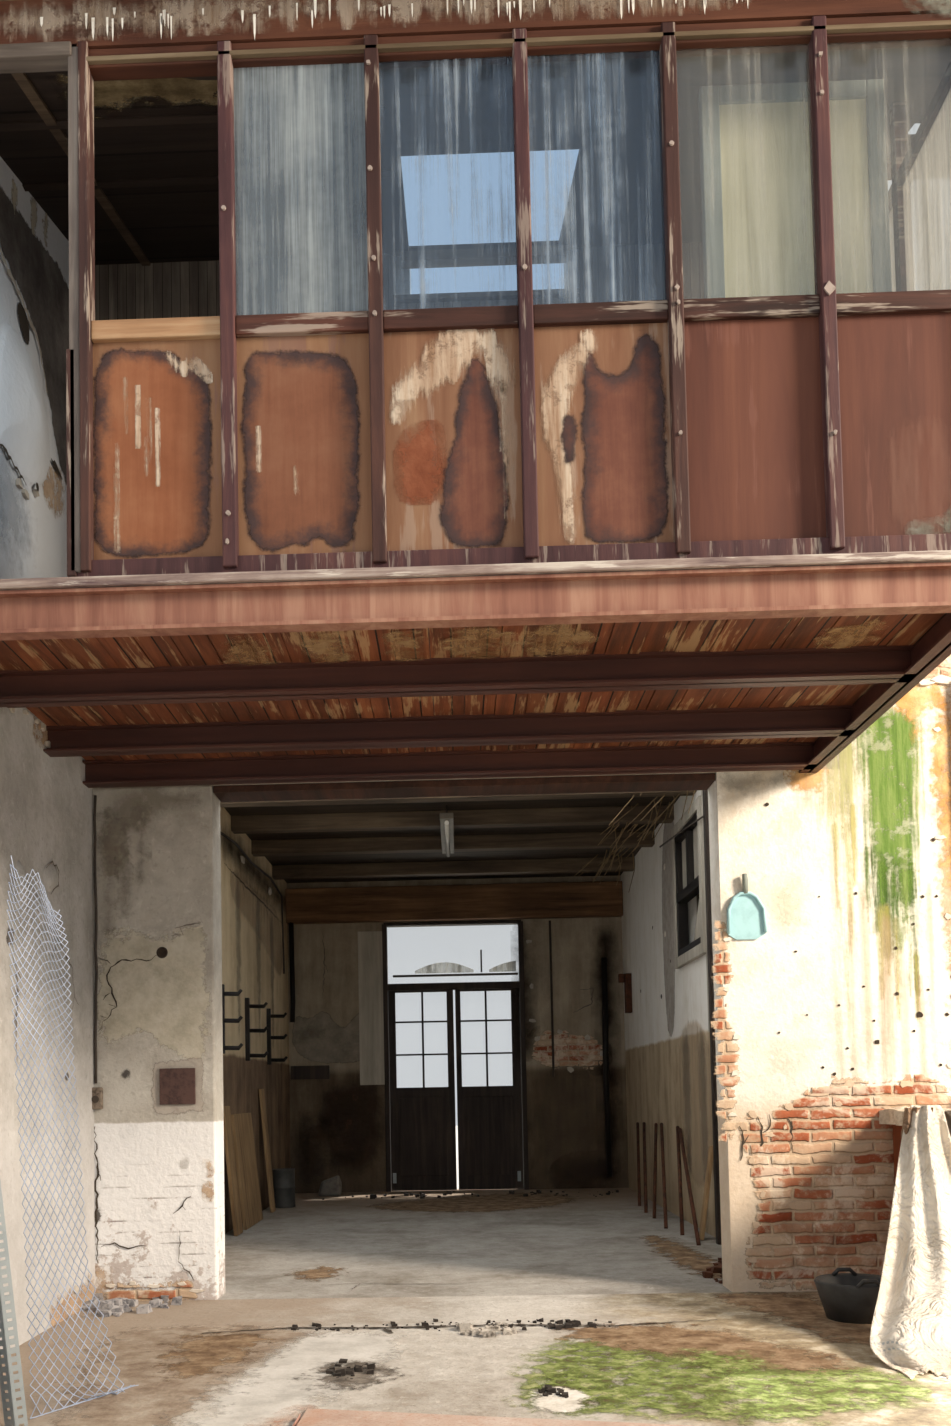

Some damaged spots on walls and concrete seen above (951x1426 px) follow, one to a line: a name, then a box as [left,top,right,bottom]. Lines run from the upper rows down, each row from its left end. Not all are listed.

flaking render [0,179,69,513]
peeling [303,634,350,663]
peeling [444,624,594,659]
peeling [821,620,880,649]
flaking render [918,655,951,969]
crack [51,912,198,1023]
flaking render [711,920,951,1290]
flaking render [202,1163,214,1201]